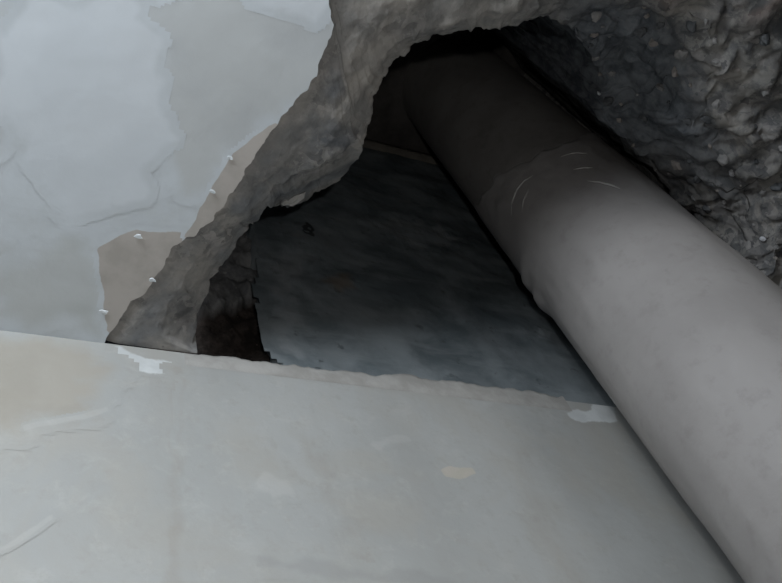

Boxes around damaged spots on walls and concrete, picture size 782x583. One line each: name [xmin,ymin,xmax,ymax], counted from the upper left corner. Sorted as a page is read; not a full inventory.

leakage [0,223,107,343]
leakage [148,0,334,208]
leakage [251,220,328,369]
spalling [92,0,782,362]